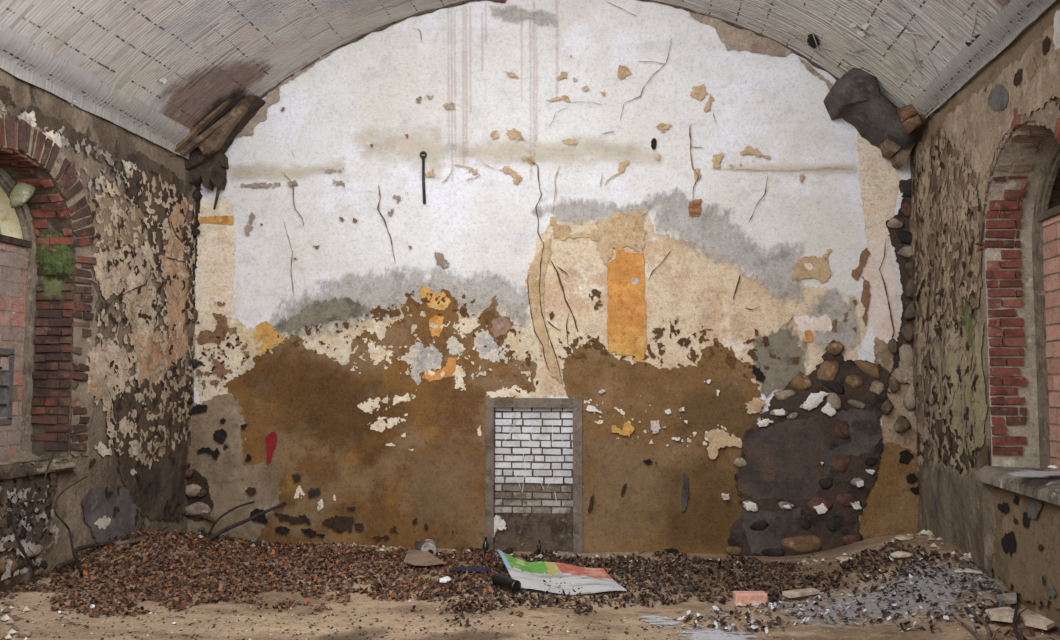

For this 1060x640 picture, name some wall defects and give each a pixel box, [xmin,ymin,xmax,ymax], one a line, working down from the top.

water stain [194,90,250,136]
crack [550,39,672,134]
crack [377,185,395,260]
crack [443,158,578,379]
flaking render [791,249,832,284]
water stain [271,269,529,338]
peeling [118,409,140,439]
peeling [128,424,169,469]
flaking render [81,485,144,543]